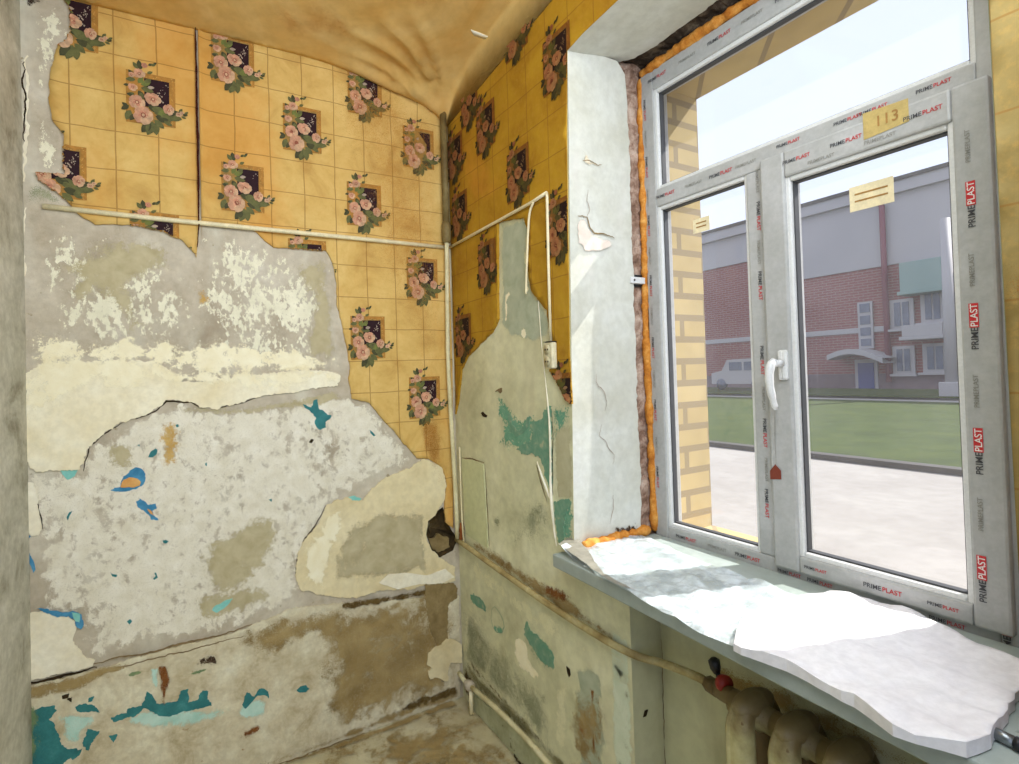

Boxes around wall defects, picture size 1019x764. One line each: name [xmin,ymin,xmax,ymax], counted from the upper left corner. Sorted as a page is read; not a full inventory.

peeling [26,221,589,764]
leakage [239,587,519,764]
peeling [604,634,648,764]